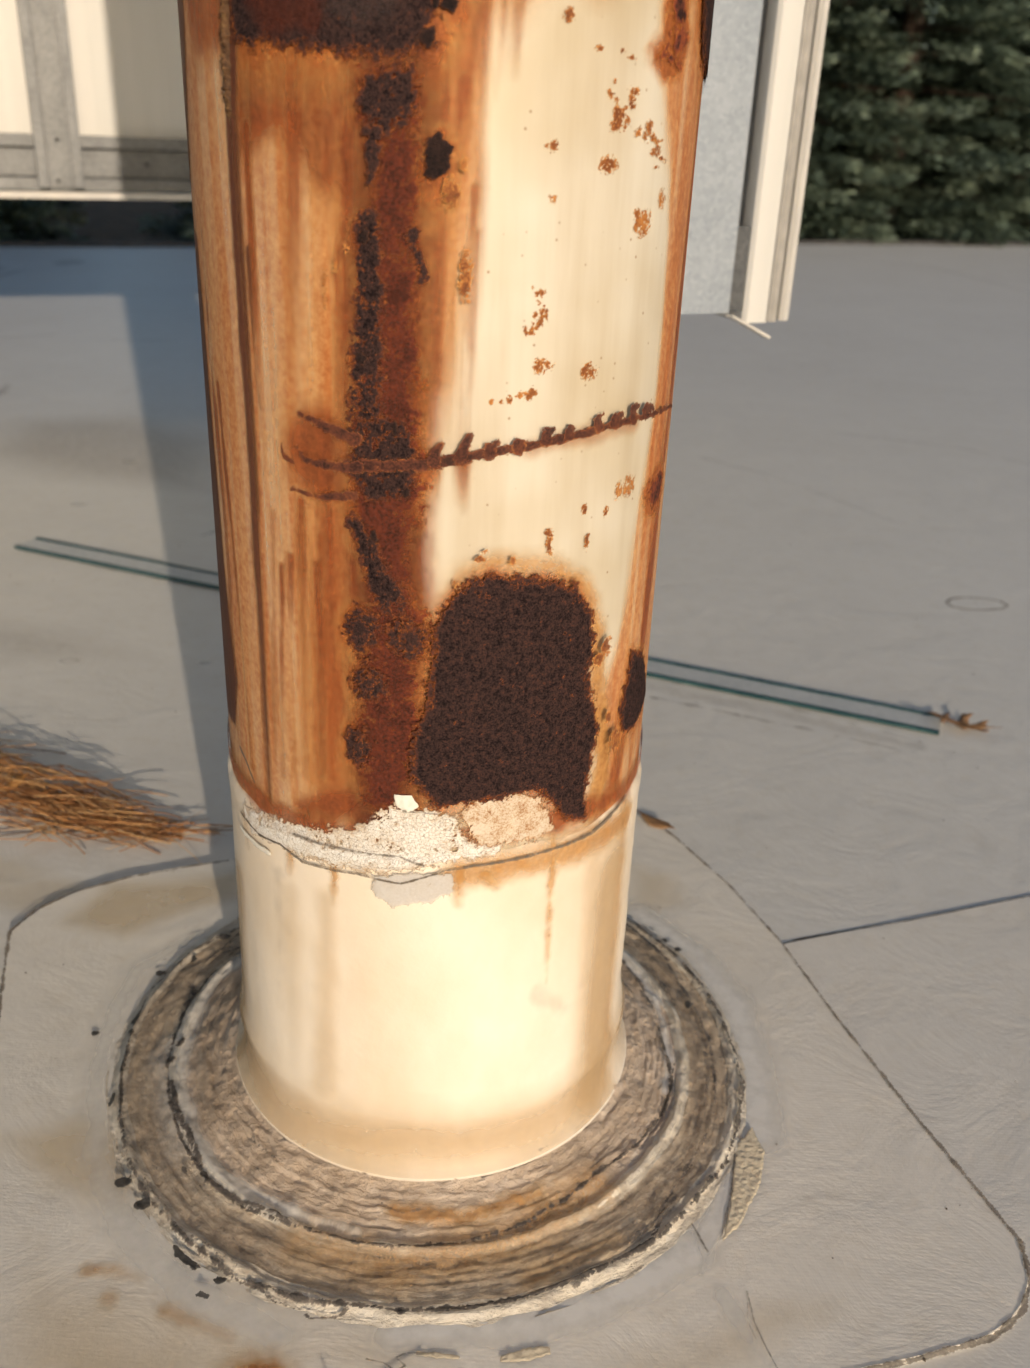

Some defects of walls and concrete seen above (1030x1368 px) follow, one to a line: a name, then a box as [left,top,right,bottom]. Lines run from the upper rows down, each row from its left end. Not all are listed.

peeling [240,793,554,909]
rust [177,0,715,889]